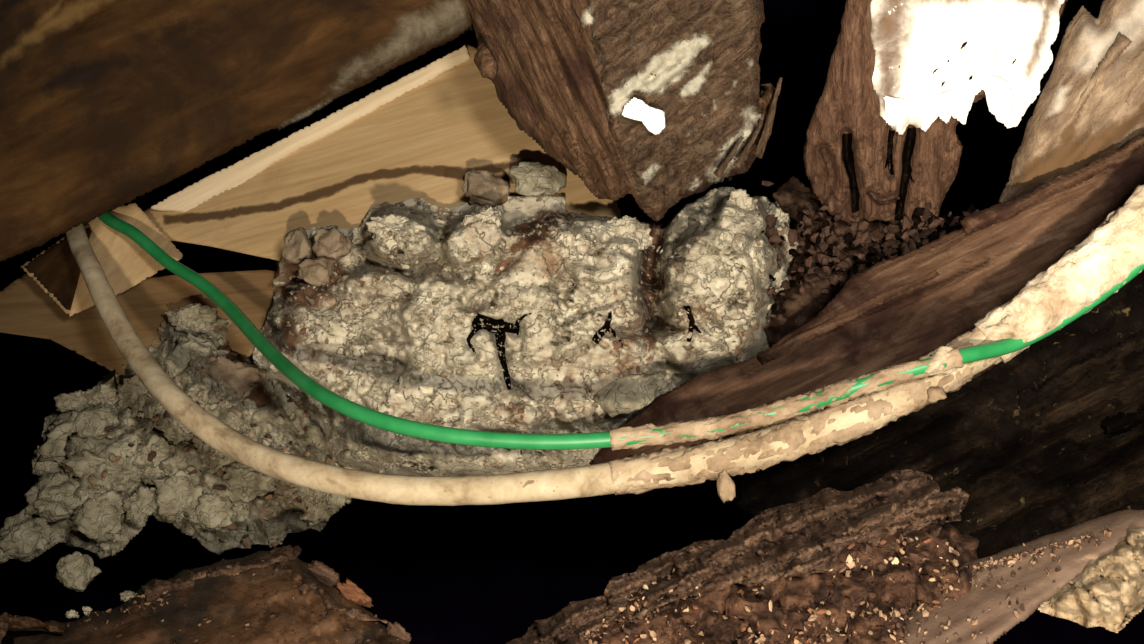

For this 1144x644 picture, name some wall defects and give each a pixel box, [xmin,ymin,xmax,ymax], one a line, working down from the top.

crack [466,313,532,390]